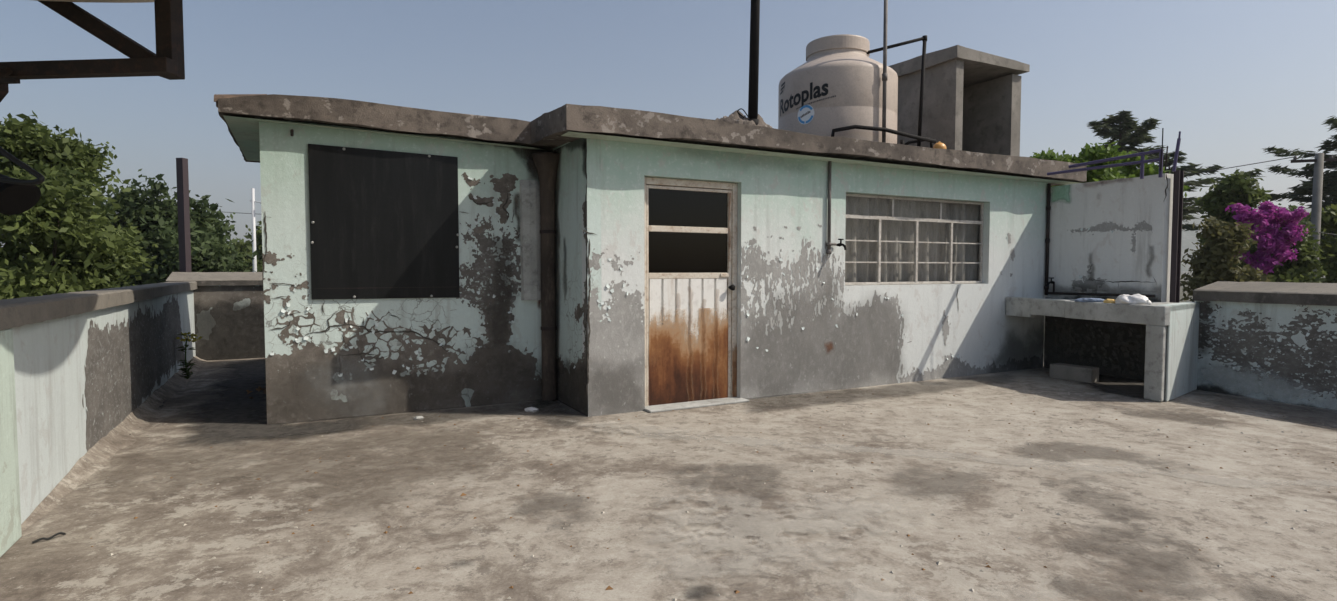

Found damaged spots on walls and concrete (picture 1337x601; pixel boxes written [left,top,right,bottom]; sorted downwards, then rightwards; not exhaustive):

crack [262,215,452,375]
peeling [82,172,645,451]
corrosion [649,308,737,406]
peeling [741,224,1044,399]
peeling [1067,220,1152,253]
peeling [1198,301,1337,401]